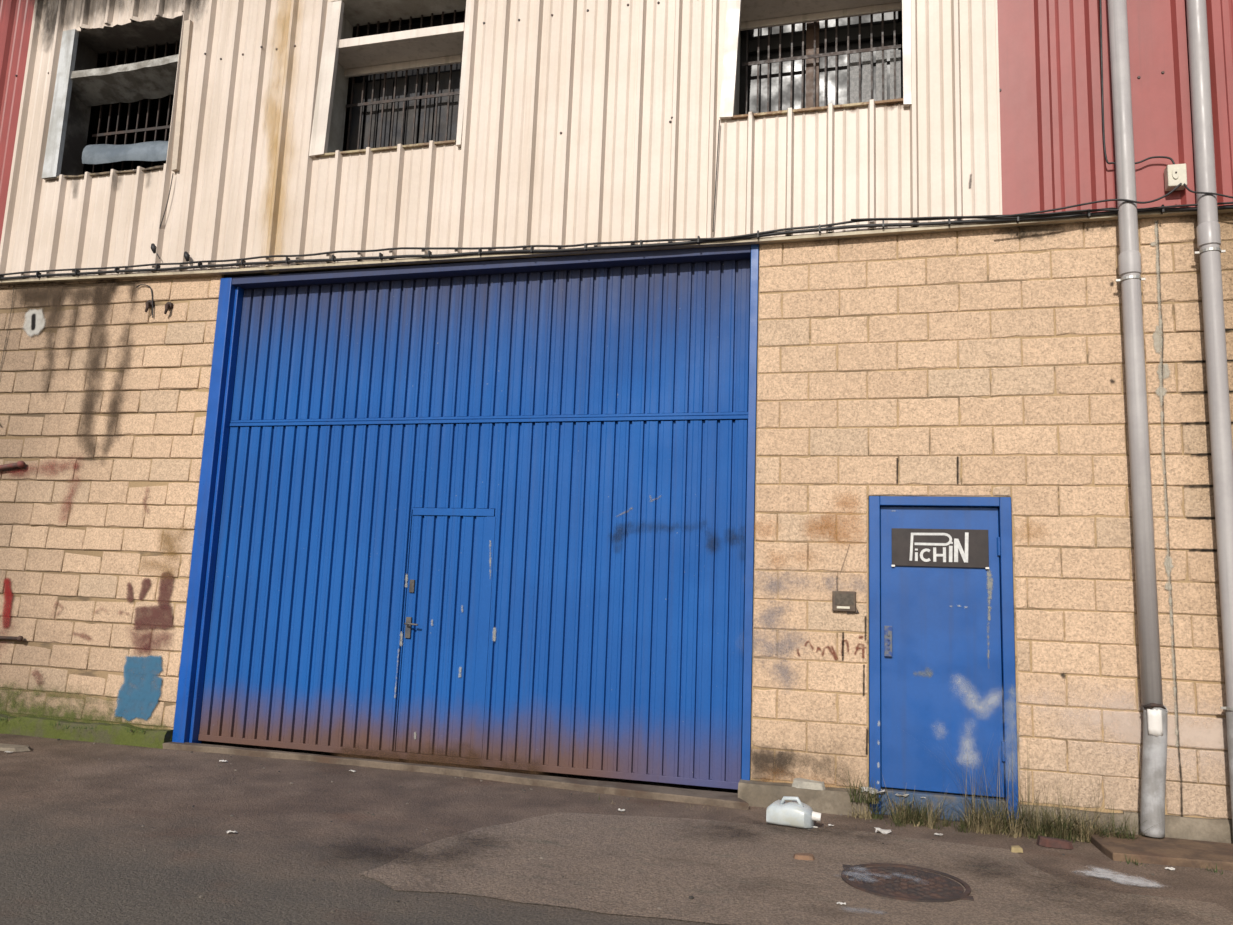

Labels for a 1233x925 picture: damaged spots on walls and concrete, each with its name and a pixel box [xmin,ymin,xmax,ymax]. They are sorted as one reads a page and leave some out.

damp [38,0,120,40]
damp [15,279,137,453]